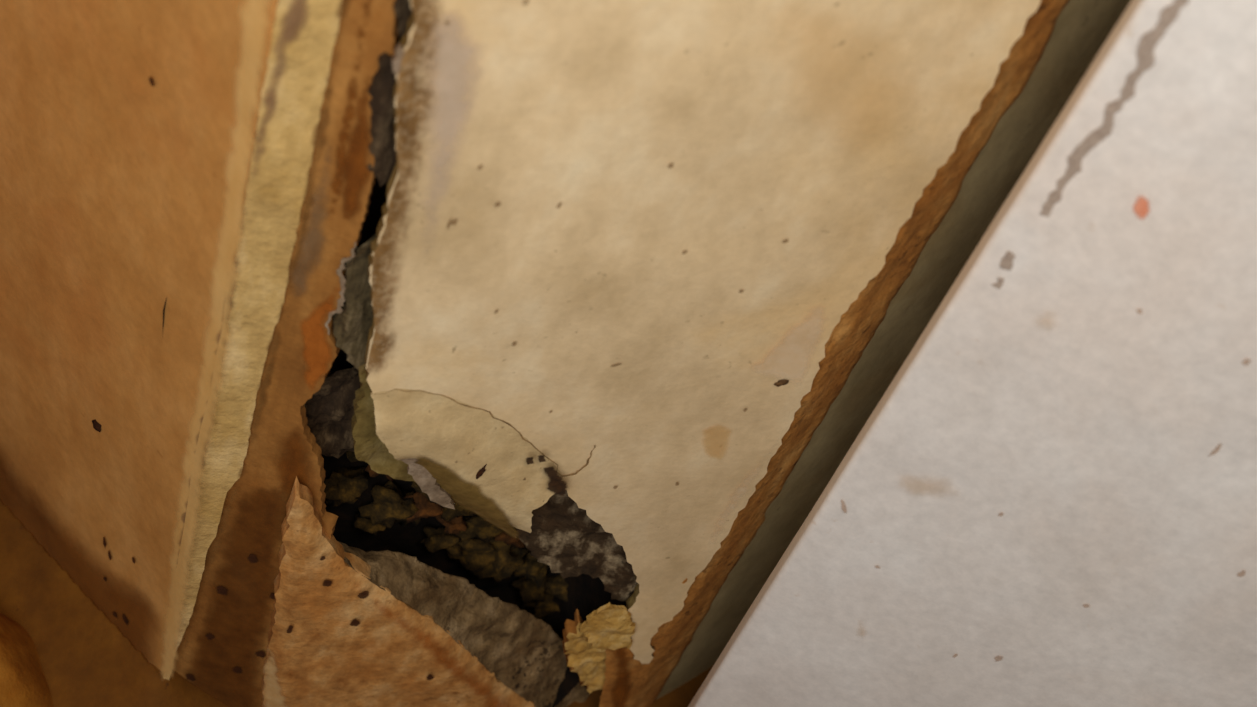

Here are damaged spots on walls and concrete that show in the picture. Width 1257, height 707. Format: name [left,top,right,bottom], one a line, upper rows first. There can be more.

crack [325,233,377,370]
crack [367,0,413,187]
damp [367,0,467,370]
spalling [304,0,1070,707]
damp [1134,198,1149,219]
peeling [264,657,286,707]